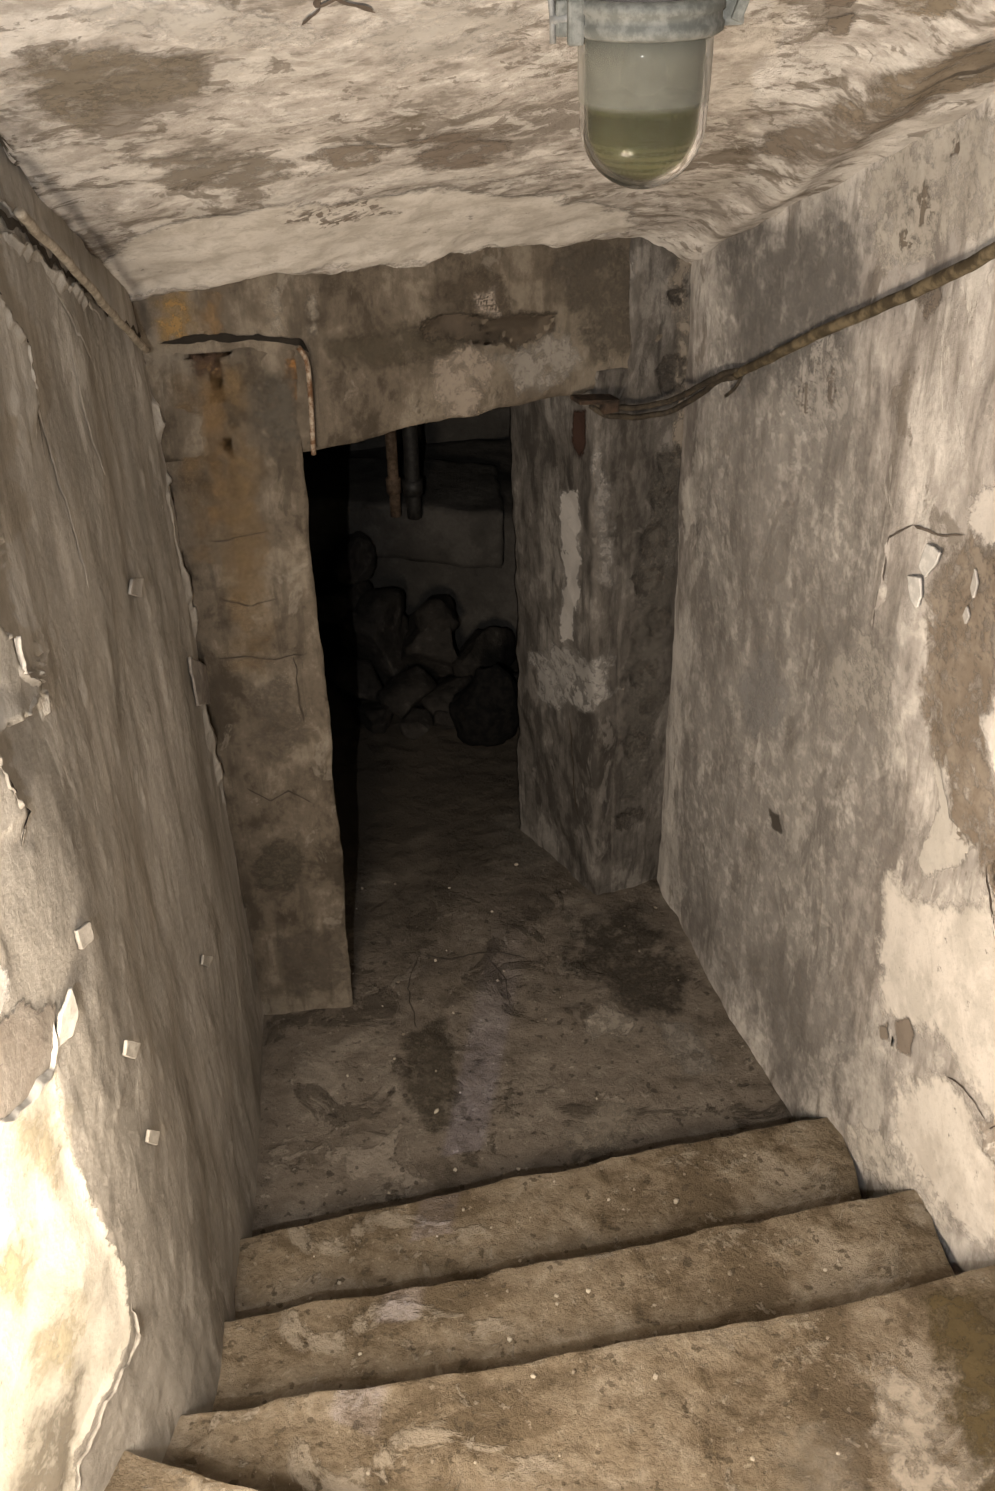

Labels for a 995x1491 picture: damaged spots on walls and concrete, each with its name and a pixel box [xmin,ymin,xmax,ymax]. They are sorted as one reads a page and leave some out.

damp [21,2,325,133]
crack [302,0,375,25]
damp [358,0,532,71]
peeling [859,109,995,270]
damp [102,128,638,417]
peeling [793,334,856,452]
peeling [907,543,942,608]
peeling [962,568,979,624]
peeling [968,485,995,547]
peeling [916,747,976,878]
peeling [875,870,995,1251]
spalling [0,965,141,1491]